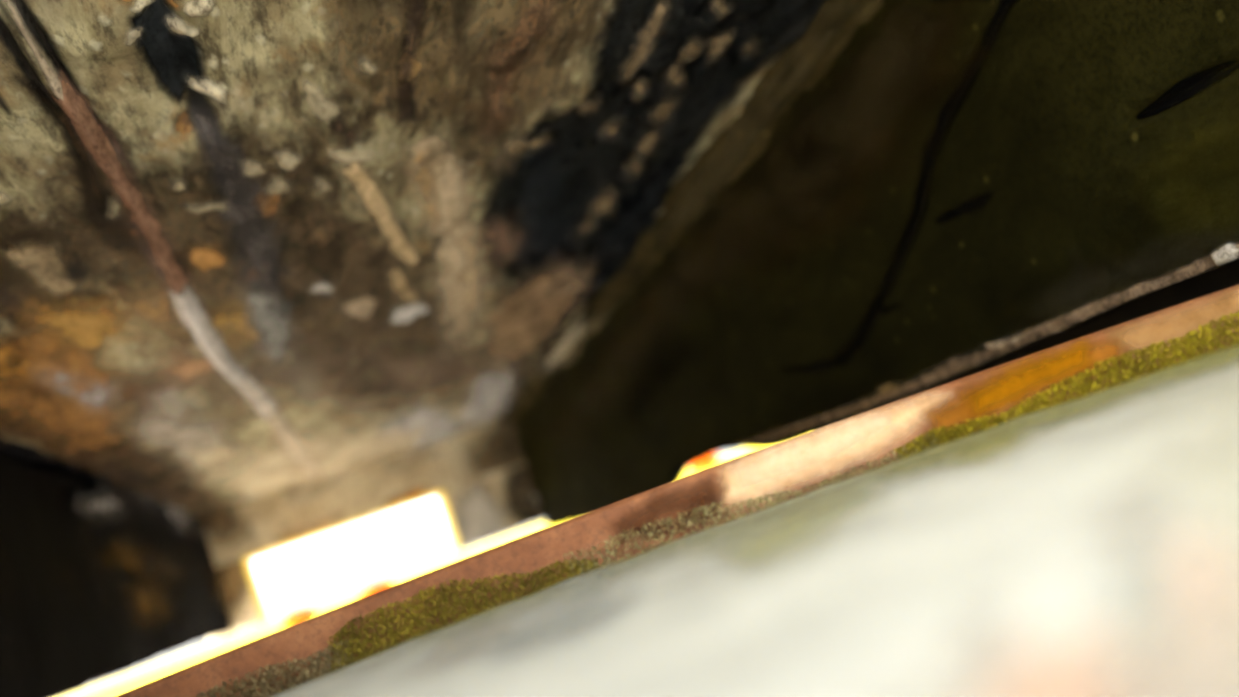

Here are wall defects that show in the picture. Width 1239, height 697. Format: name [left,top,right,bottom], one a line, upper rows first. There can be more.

crack [1137,60,1239,120]
rust [0,78,224,454]
leakage [0,0,943,547]
rust [929,339,1126,433]
rust [388,488,428,506]